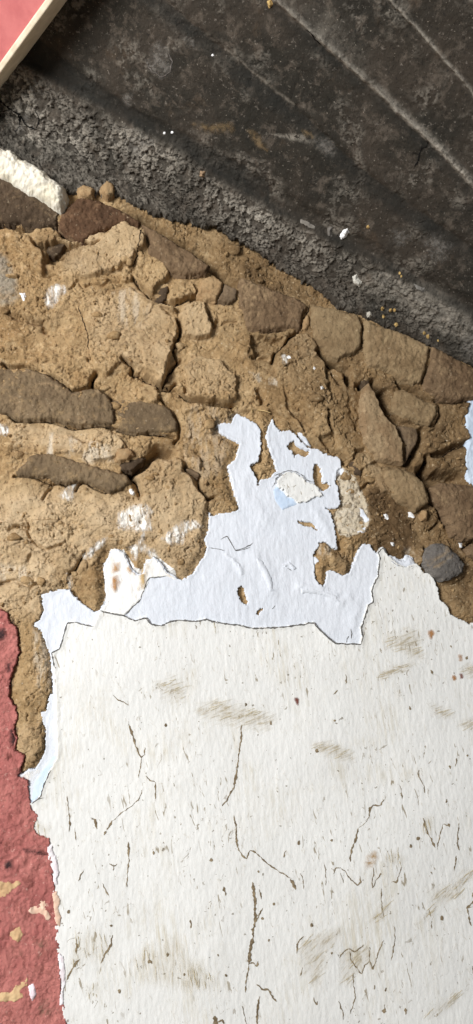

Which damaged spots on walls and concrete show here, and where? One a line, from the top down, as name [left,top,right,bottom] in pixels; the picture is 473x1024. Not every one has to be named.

crack [122,229,186,402]
spalling [0,194,473,803]
crack [67,696,156,895]
crack [423,818,459,869]
spalling [0,881,20,897]
spalling [10,927,23,942]
peeling [28,845,61,926]
crack [67,935,113,980]
crack [212,725,425,1024]
crack [431,892,473,928]
spalling [0,978,36,1002]